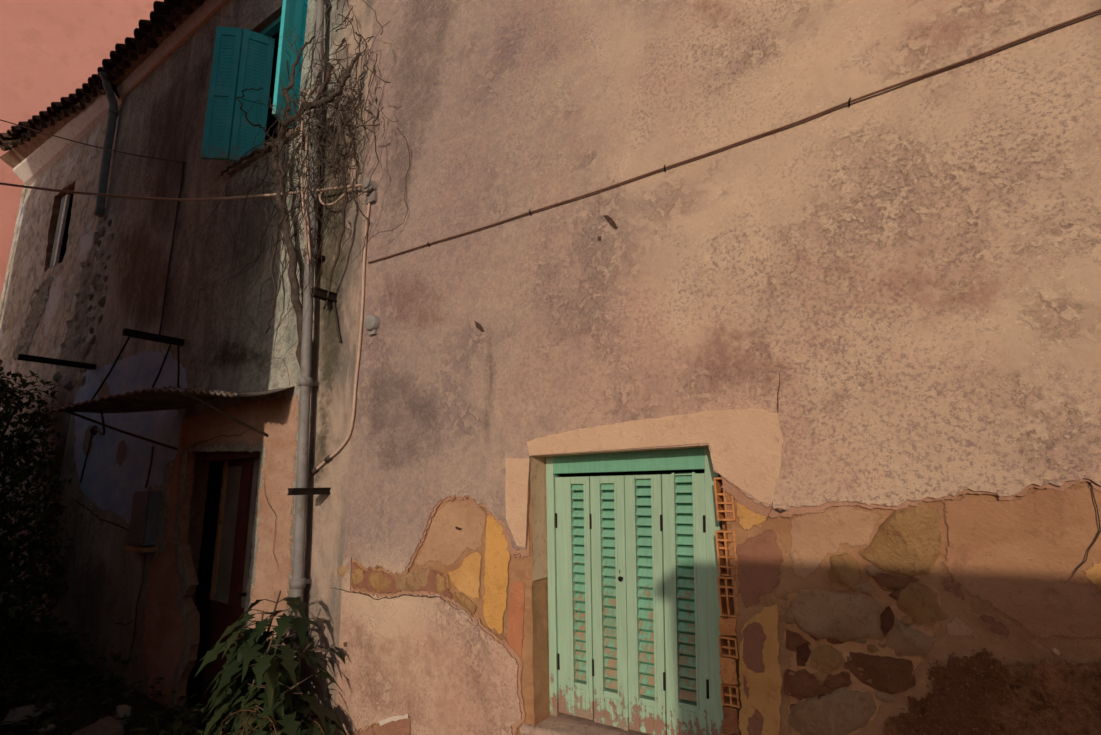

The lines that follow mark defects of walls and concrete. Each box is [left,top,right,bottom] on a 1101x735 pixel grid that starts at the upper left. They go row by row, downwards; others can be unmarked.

peeling [71,349,188,531]
flaking render [335,499,525,658]
flaking render [736,484,1101,735]
flaking render [349,714,411,735]